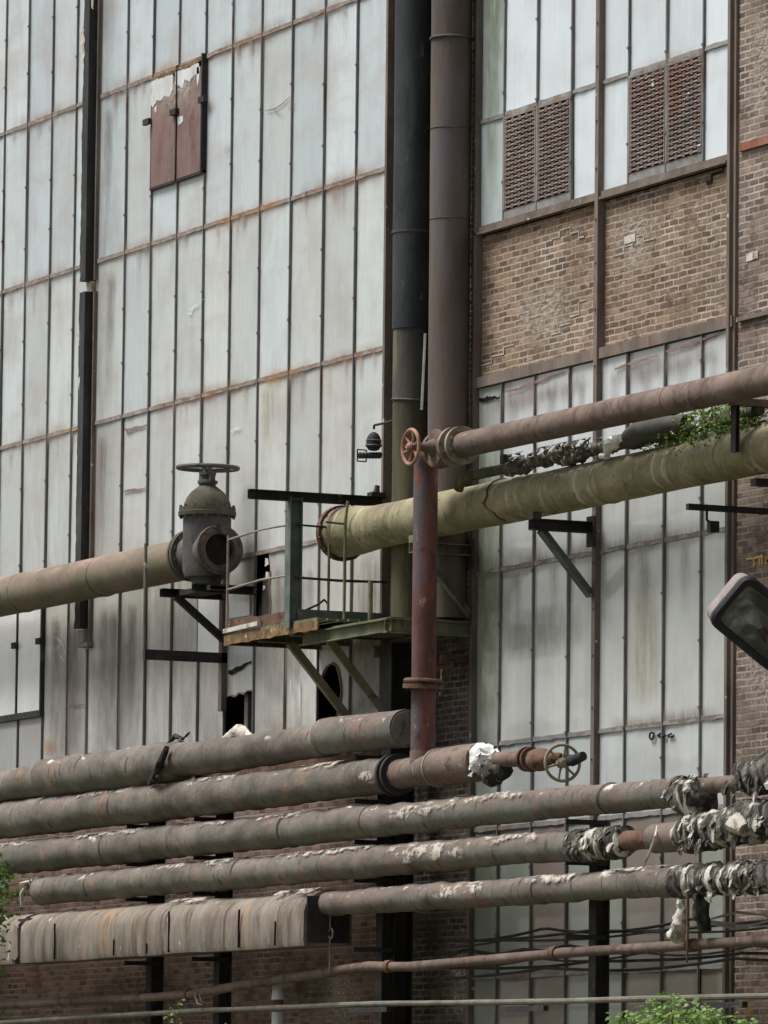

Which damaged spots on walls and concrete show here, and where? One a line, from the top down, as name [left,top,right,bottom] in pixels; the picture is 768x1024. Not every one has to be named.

peeling [150,57,201,113]